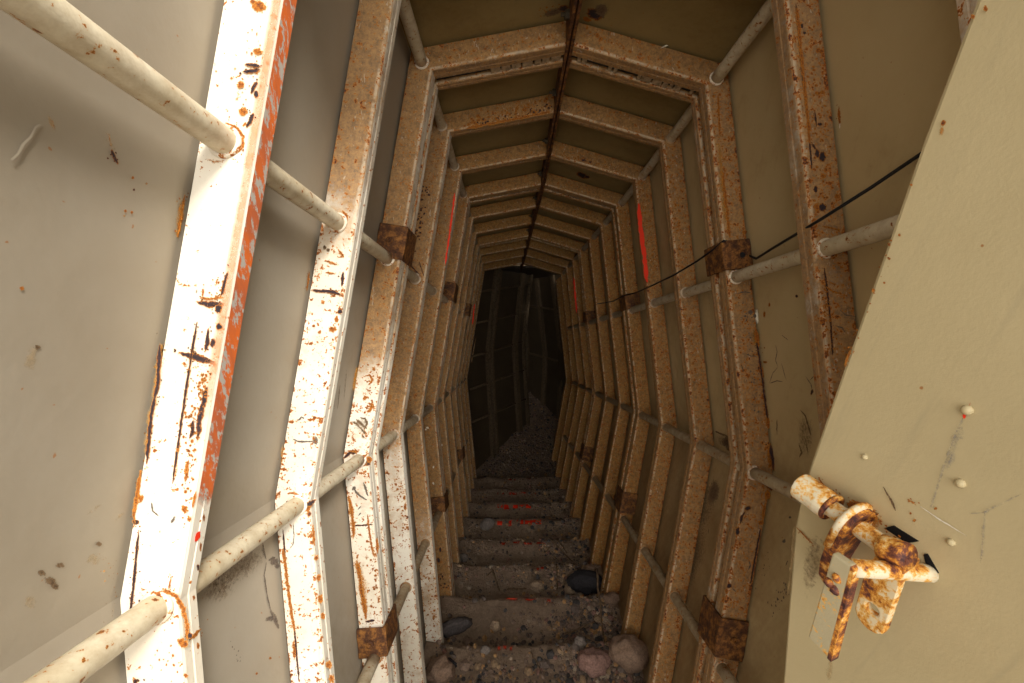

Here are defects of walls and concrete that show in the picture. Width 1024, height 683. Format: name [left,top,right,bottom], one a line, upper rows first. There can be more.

corrosion [250,0,267,13]
corrosion [226,26,263,155]
corrosion [790,3,841,214]
corrosion [304,245,345,346]
corrosion [103,264,229,609]
corrosion [343,449,372,475]
corrosion [353,364,377,414]
corrosion [154,573,208,678]
corrosion [282,532,300,681]
corrosion [286,489,319,561]
corrosion [347,493,380,624]
corrosion [827,565,859,662]